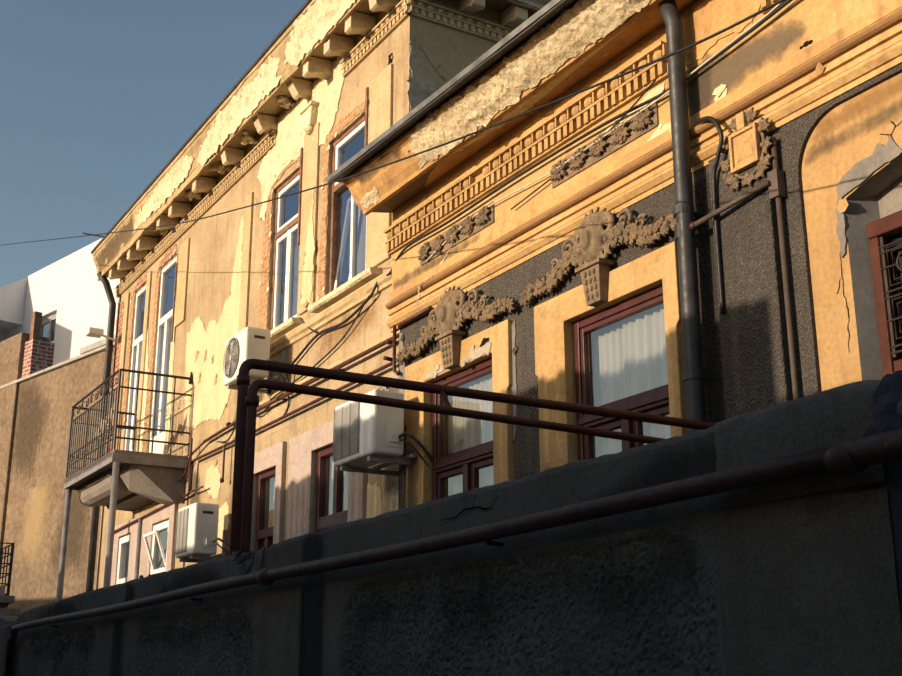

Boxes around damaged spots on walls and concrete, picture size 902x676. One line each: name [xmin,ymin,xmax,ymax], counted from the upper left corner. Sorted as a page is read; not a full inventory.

spalling [134,0,356,229]
spalling [407,0,651,169]
peeling [604,82,666,132]
peeling [646,121,671,143]
peeling [712,84,728,102]
spalling [252,56,370,329]
spalling [360,186,380,209]
peeling [836,135,902,258]
peeling [184,215,244,429]
crack [837,254,850,349]
spalling [366,457,399,518]
crack [438,494,499,521]